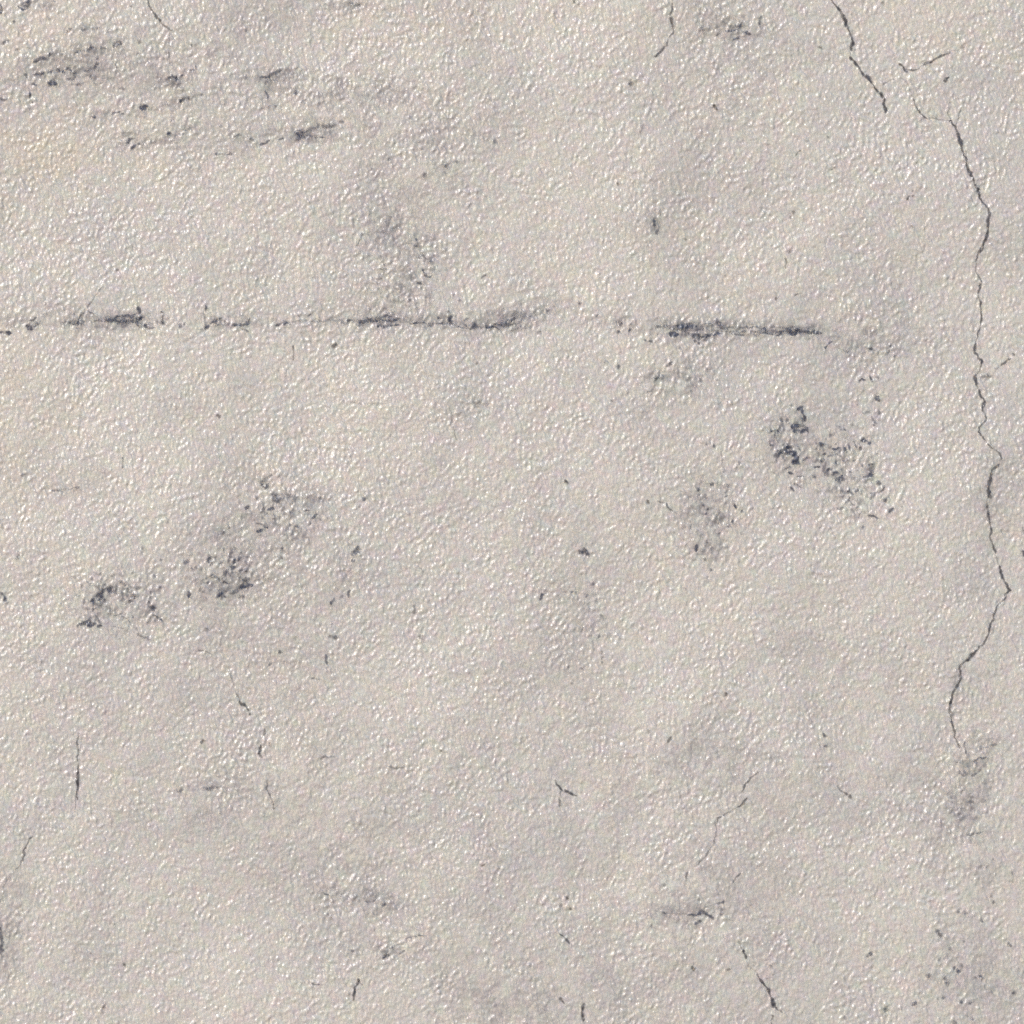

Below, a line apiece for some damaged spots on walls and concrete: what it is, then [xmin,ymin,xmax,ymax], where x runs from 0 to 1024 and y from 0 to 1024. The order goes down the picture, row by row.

crack [831,0,887,113]
crack [899,54,949,82]
crack [949,120,1011,746]